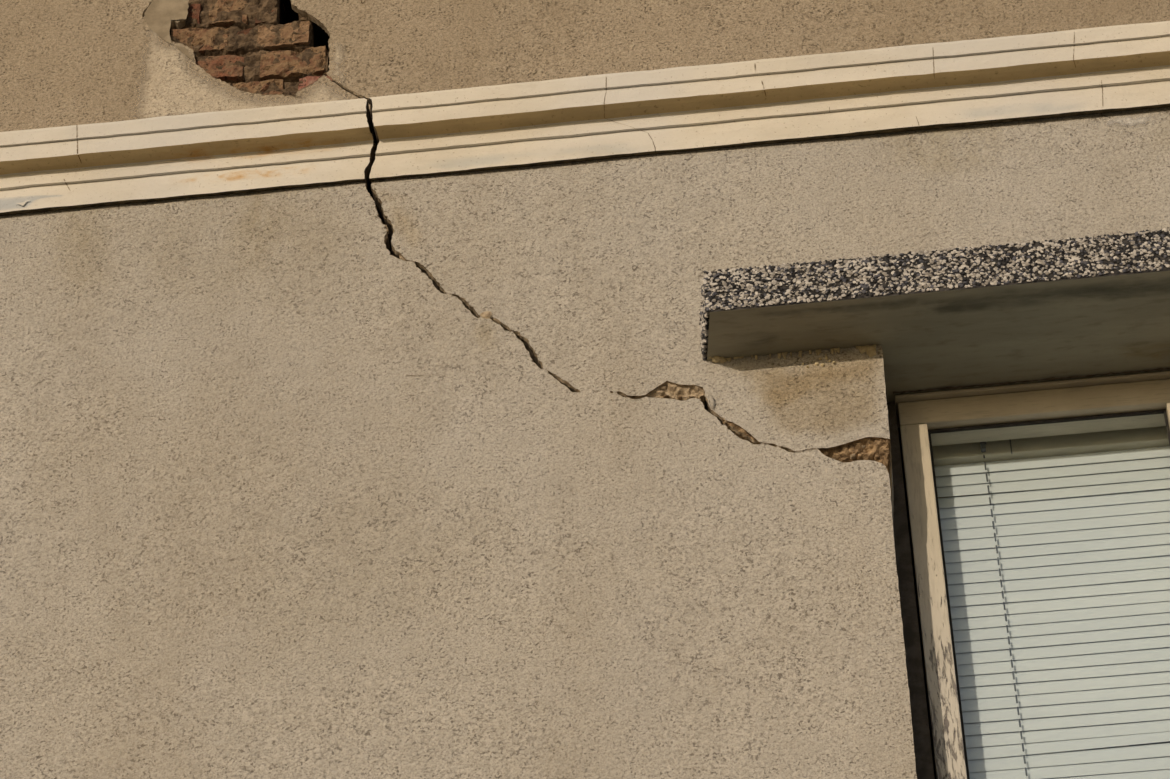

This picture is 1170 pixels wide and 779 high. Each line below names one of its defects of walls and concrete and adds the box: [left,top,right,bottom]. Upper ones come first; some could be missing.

spalling [144,0,332,99]
crack [323,72,580,392]
crack [610,391,649,399]
crack [700,395,815,453]